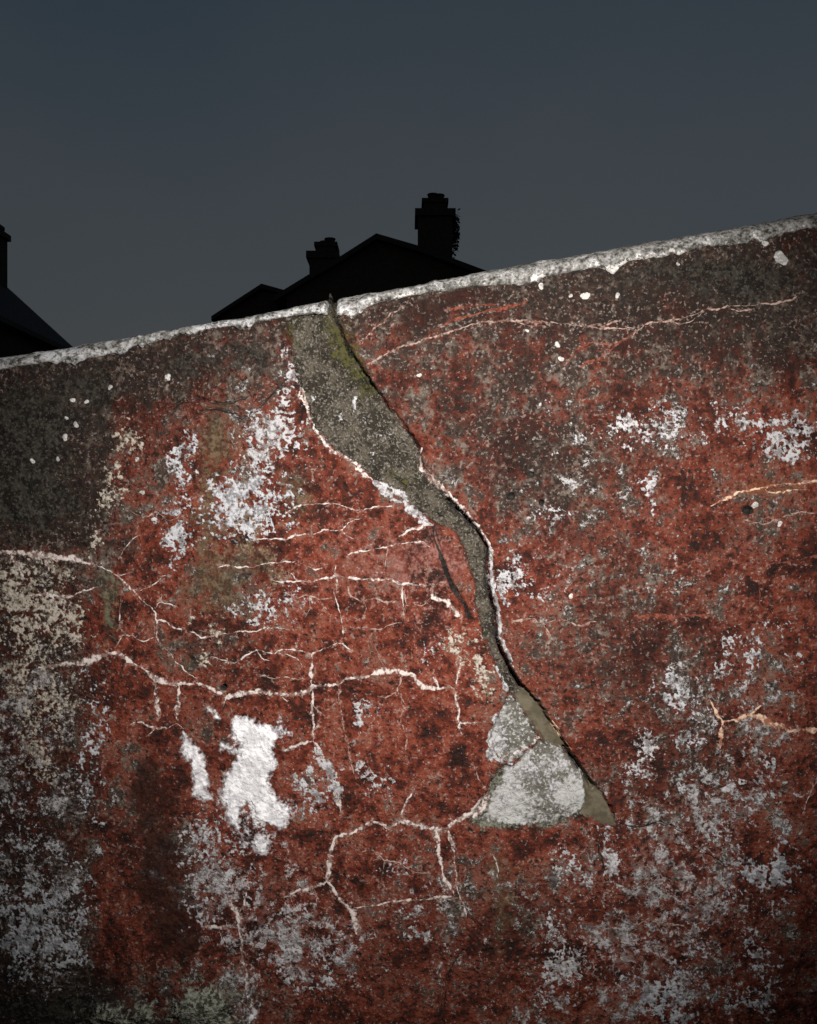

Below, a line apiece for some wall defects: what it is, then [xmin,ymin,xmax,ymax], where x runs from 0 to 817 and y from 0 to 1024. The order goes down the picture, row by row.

damp [190,419,236,602]
crack [0,294,817,935]
damp [181,716,297,855]